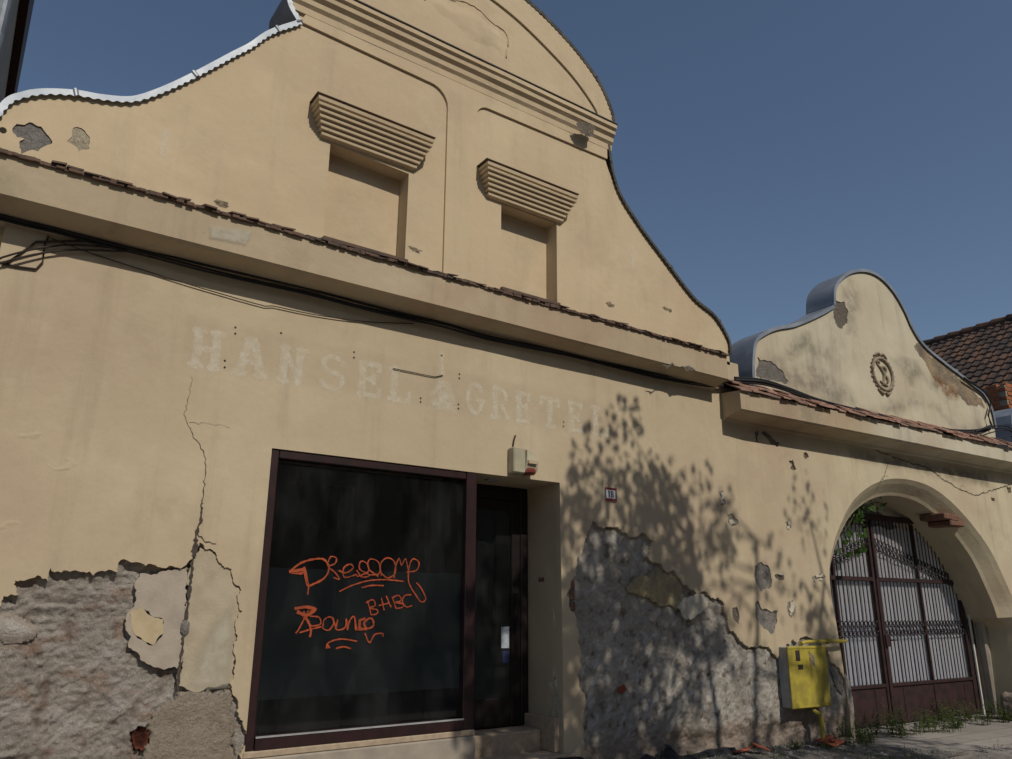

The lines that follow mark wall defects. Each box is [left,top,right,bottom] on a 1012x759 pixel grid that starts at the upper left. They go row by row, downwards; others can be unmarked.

flaking render [0,123,52,154]
peeling [67,127,90,151]
flaking render [833,301,848,328]
flaking render [756,359,788,384]
crack [177,382,229,690]
peeling [677,593,709,620]
flaking render [754,562,796,634]
flaking render [132,728,149,751]